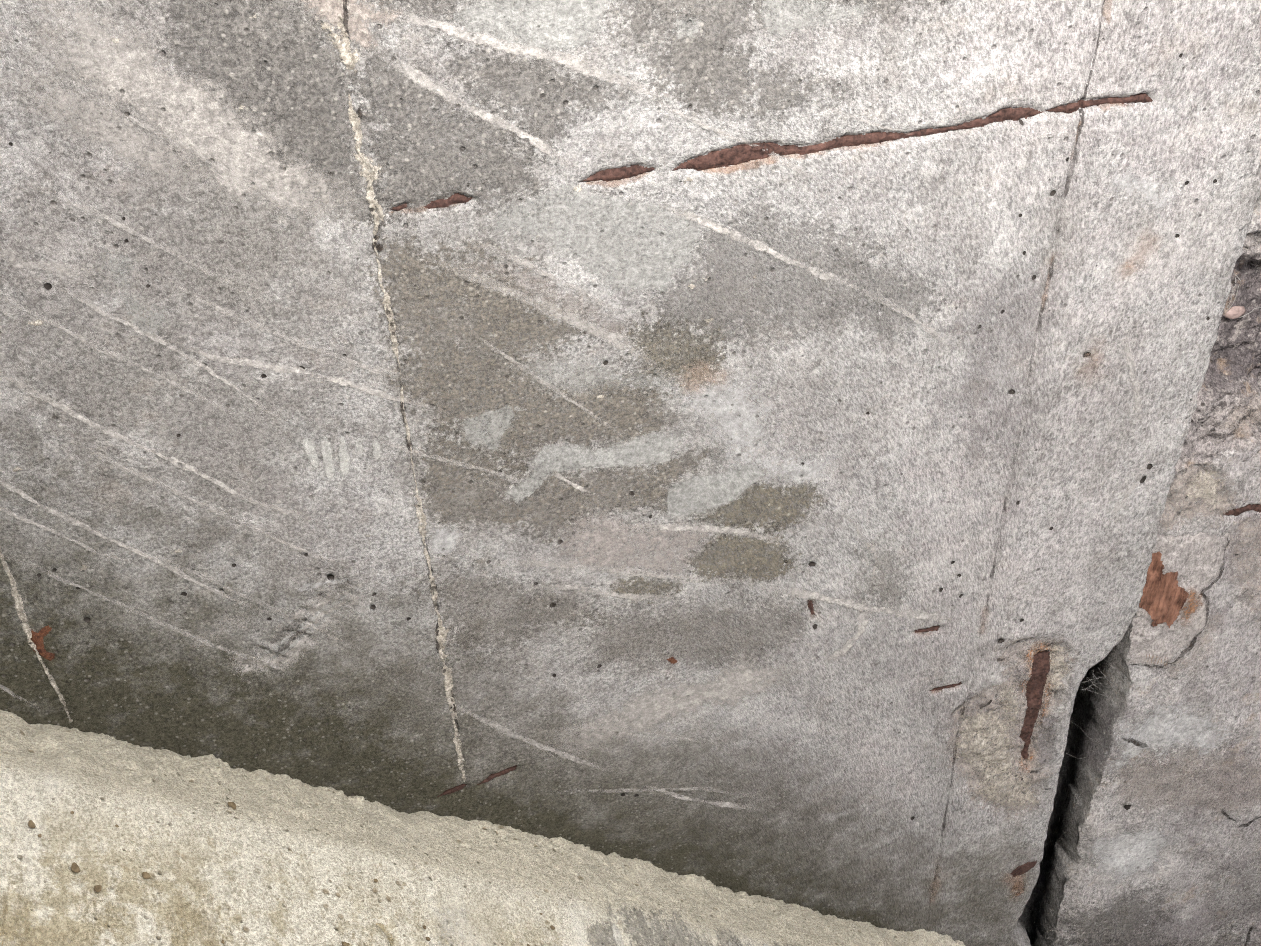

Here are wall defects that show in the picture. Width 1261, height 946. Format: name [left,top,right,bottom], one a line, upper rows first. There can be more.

crack [301,0,466,782]
crack [0,547,73,722]
crack [1222,810,1261,828]